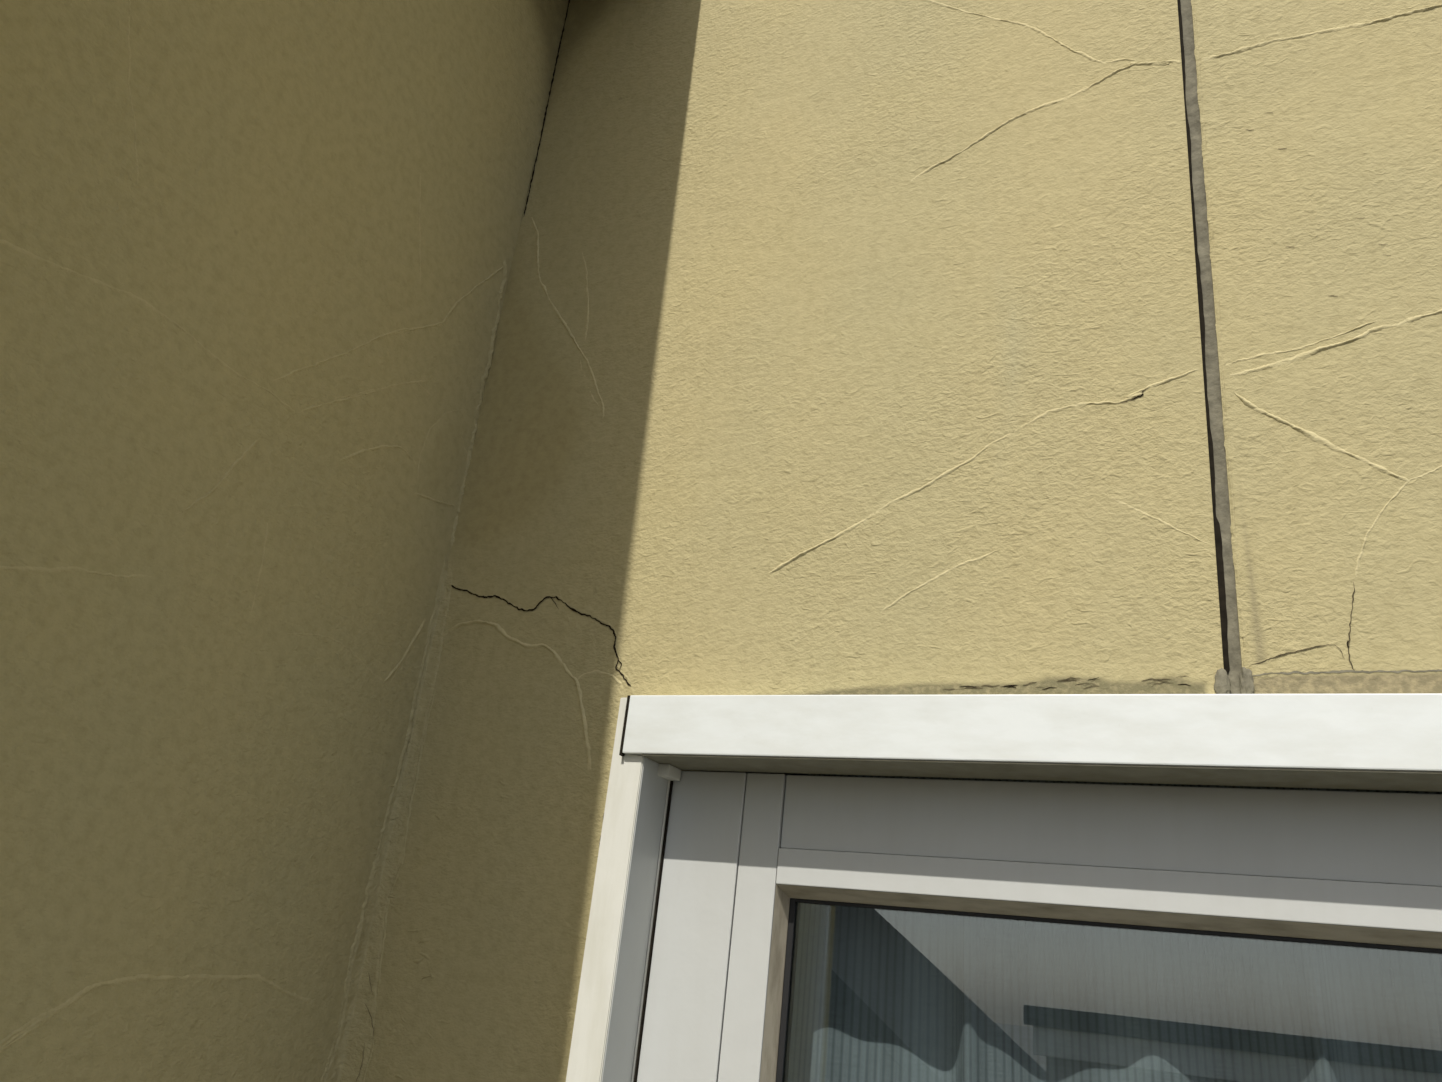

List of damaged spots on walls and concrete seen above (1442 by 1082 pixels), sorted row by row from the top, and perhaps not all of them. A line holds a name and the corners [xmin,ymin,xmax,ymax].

crack [769,309,1442,670]
crack [442,584,632,770]